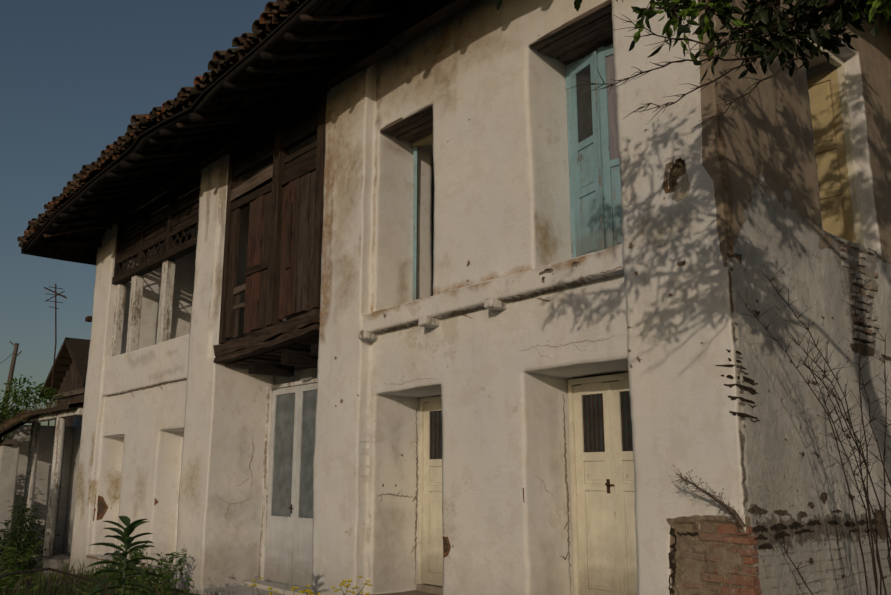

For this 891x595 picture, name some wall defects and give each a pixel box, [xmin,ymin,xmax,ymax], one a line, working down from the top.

flaking render [698,0,891,360]
leakage [320,213,333,339]
crack [379,409,418,580]
spalling [667,515,741,536]
flaking render [739,417,843,517]